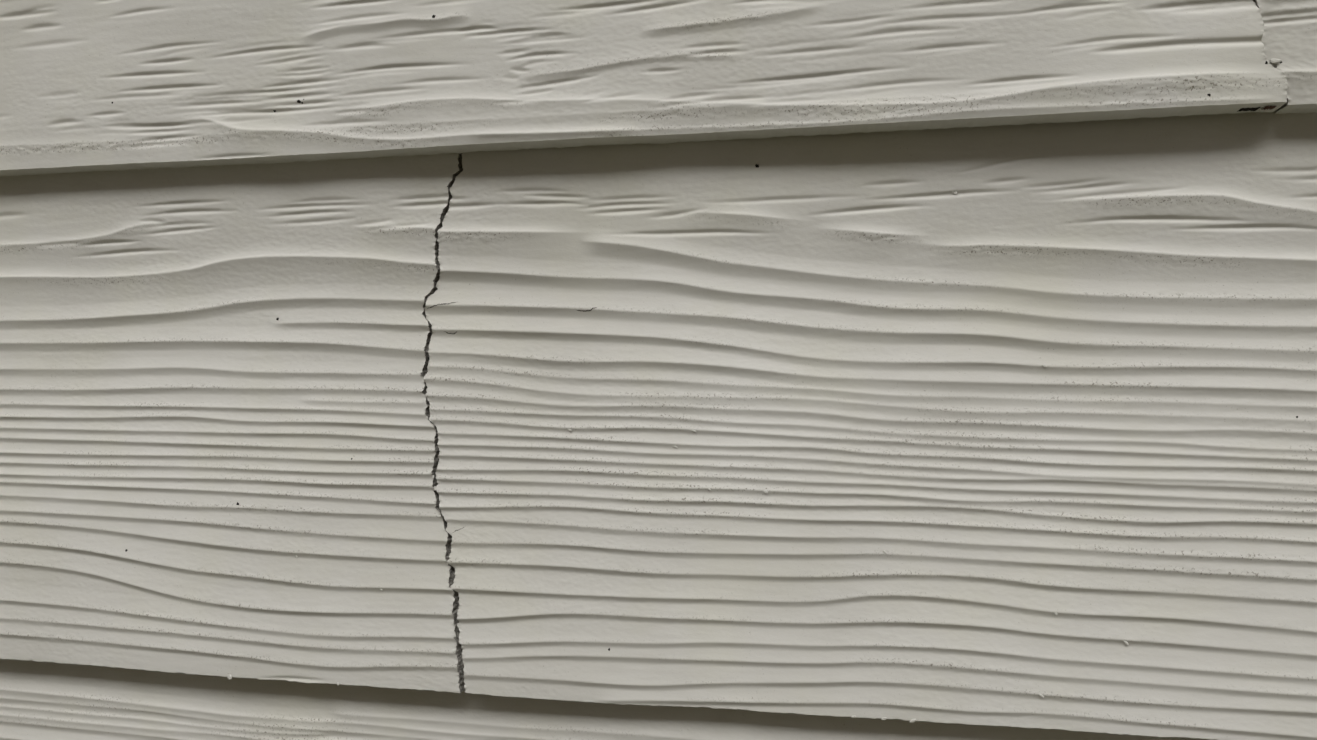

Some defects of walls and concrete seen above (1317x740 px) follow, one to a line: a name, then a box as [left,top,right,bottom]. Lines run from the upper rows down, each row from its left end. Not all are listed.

crack [420,153,465,693]